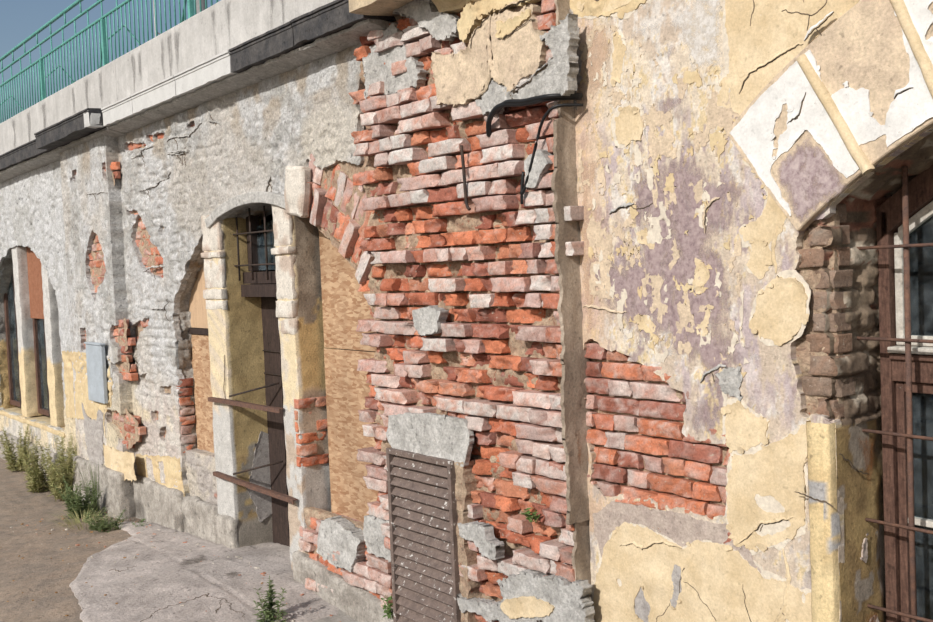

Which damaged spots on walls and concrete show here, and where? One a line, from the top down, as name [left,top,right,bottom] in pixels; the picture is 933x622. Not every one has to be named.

crack [739,0,834,94]
peeling [904,0,933,65]
peeling [831,30,933,148]
crack [131,103,221,197]
spalling [89,233,106,293]
spalling [128,210,163,278]
flaking render [294,0,861,622]
peeling [62,318,196,496]
crack [737,516,797,545]
crack [795,491,834,507]
peeling [860,533,869,563]